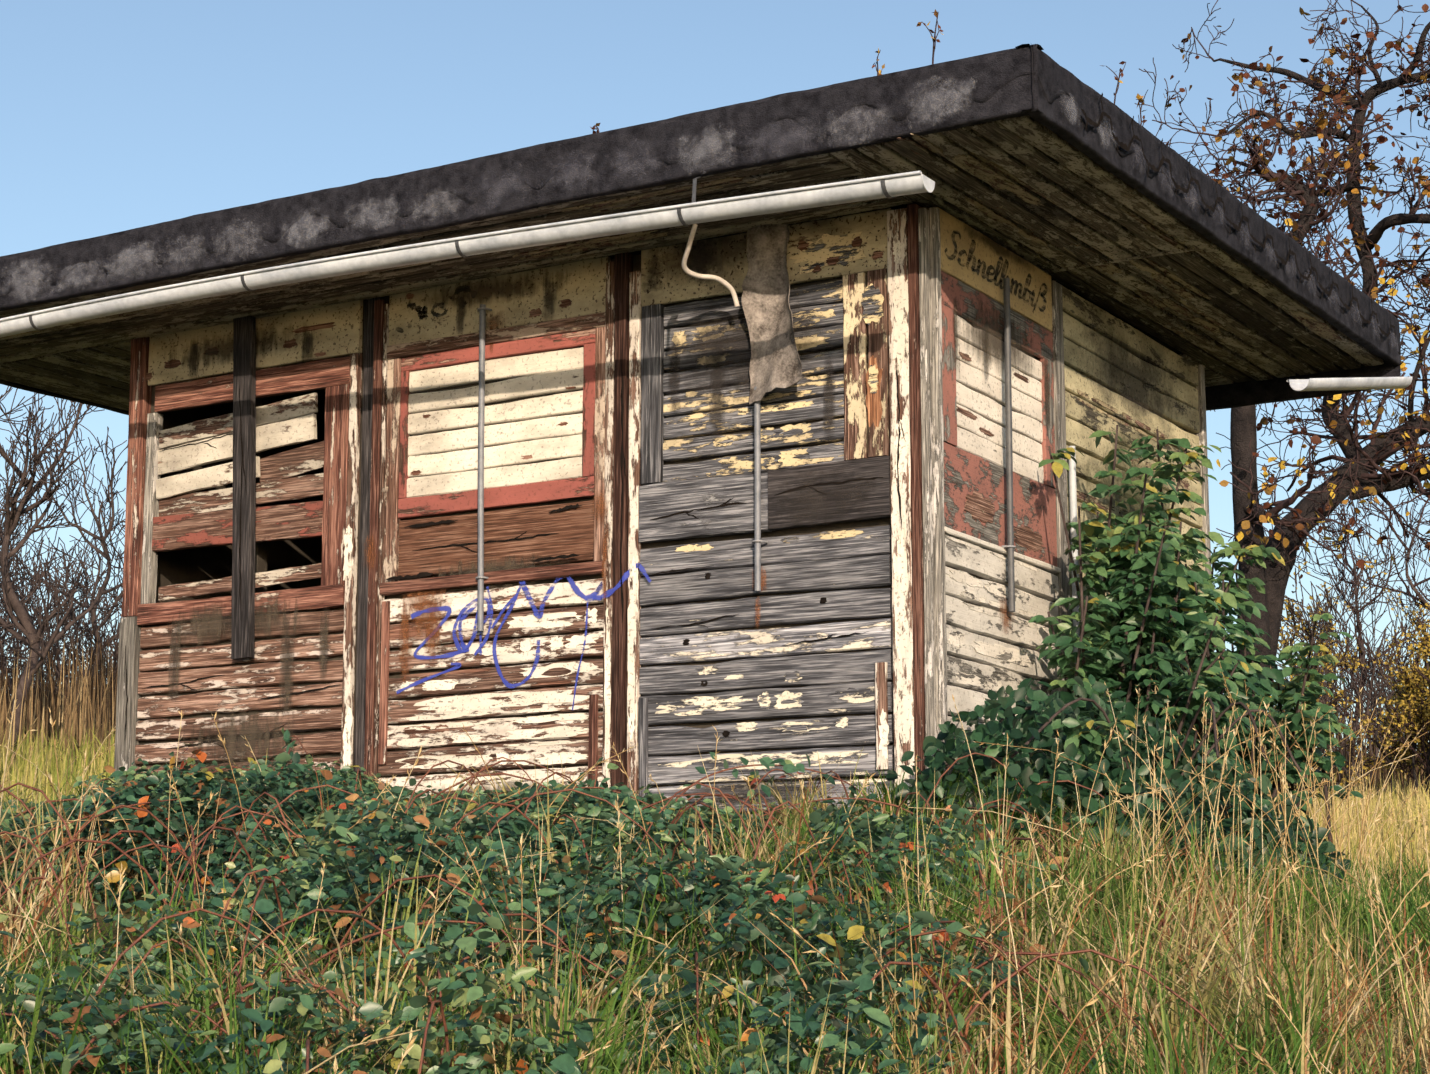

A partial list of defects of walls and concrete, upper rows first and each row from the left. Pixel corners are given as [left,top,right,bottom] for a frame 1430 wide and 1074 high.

peeling [672,325,728,345]
peeling [788,231,909,478]
peeling [670,391,706,424]
peeling [713,375,827,474]
peeling [957,406,994,436]
peeling [343,525,353,581]
peeling [143,626,194,635]
peeling [199,676,275,688]
peeling [275,650,336,659]
peeling [395,552,637,793]
peeling [655,524,914,790]
peeling [143,707,353,773]